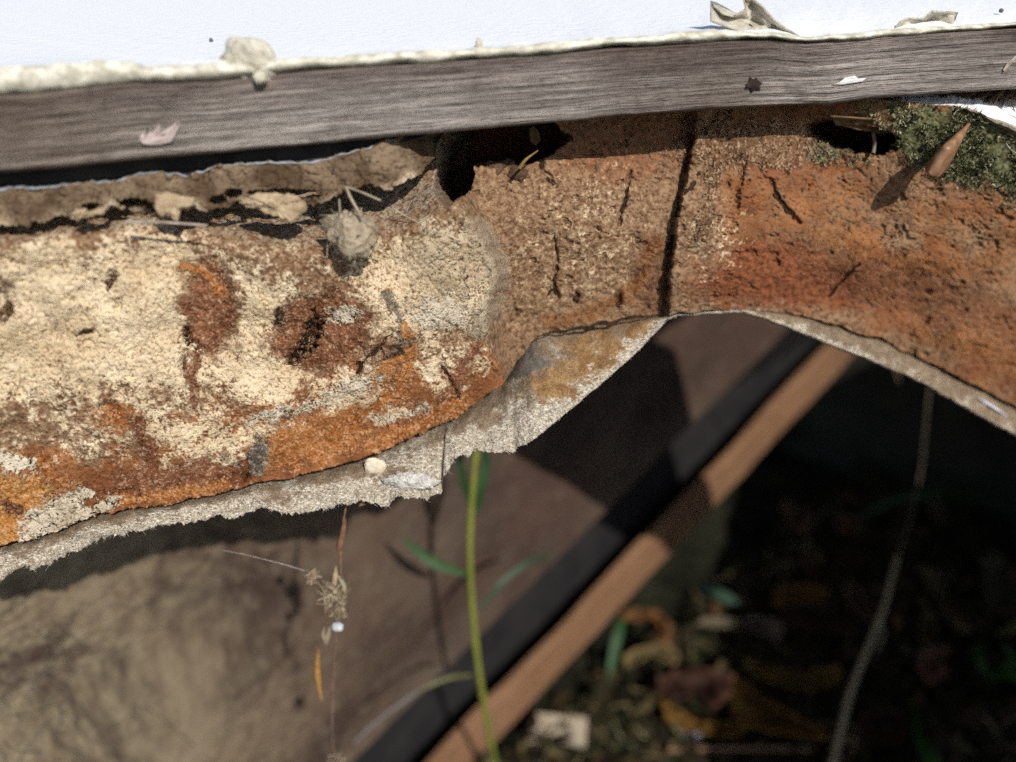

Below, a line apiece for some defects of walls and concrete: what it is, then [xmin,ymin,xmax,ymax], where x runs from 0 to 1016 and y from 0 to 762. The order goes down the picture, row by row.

peeling [0,132,444,228]
rust [170,246,246,408]
spalling [258,284,398,379]
rust [81,319,488,512]
rust [0,450,85,545]